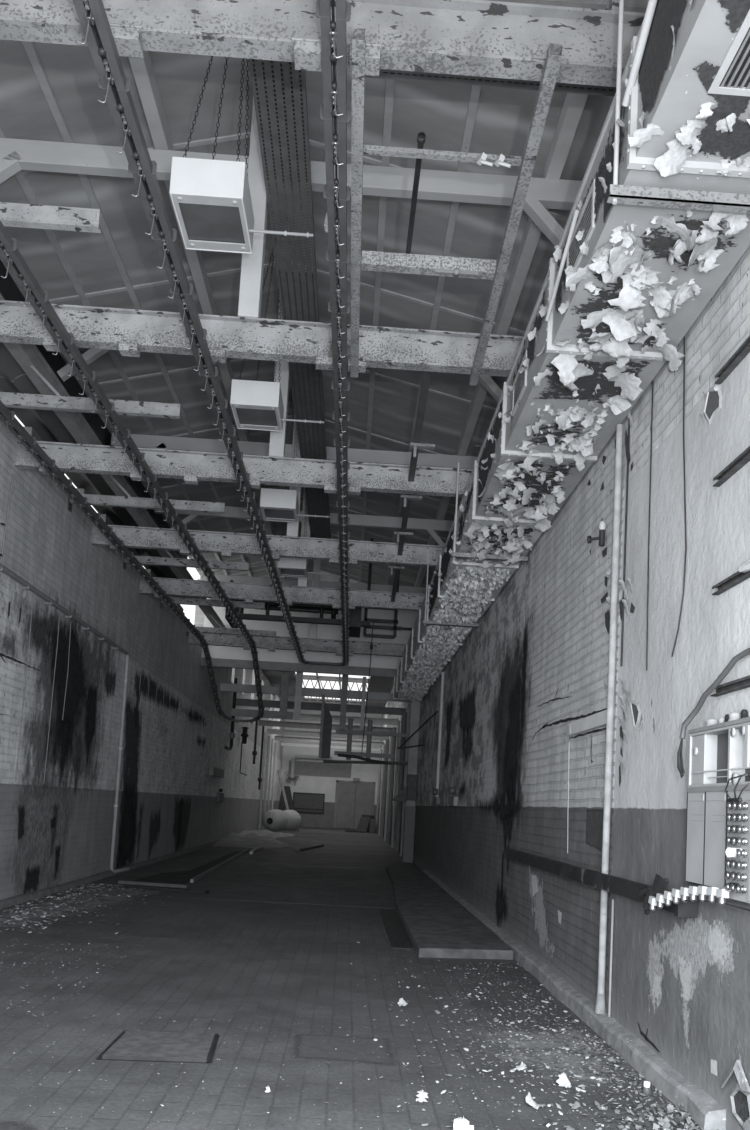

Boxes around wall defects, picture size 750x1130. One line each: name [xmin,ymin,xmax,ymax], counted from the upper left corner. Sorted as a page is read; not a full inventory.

peeling [427,0,750,619]
water stain [1,601,116,791]
water stain [117,691,191,868]
water stain [498,679,513,893]
peeling [350,936,700,1130]
spalling [720,1048,750,1130]